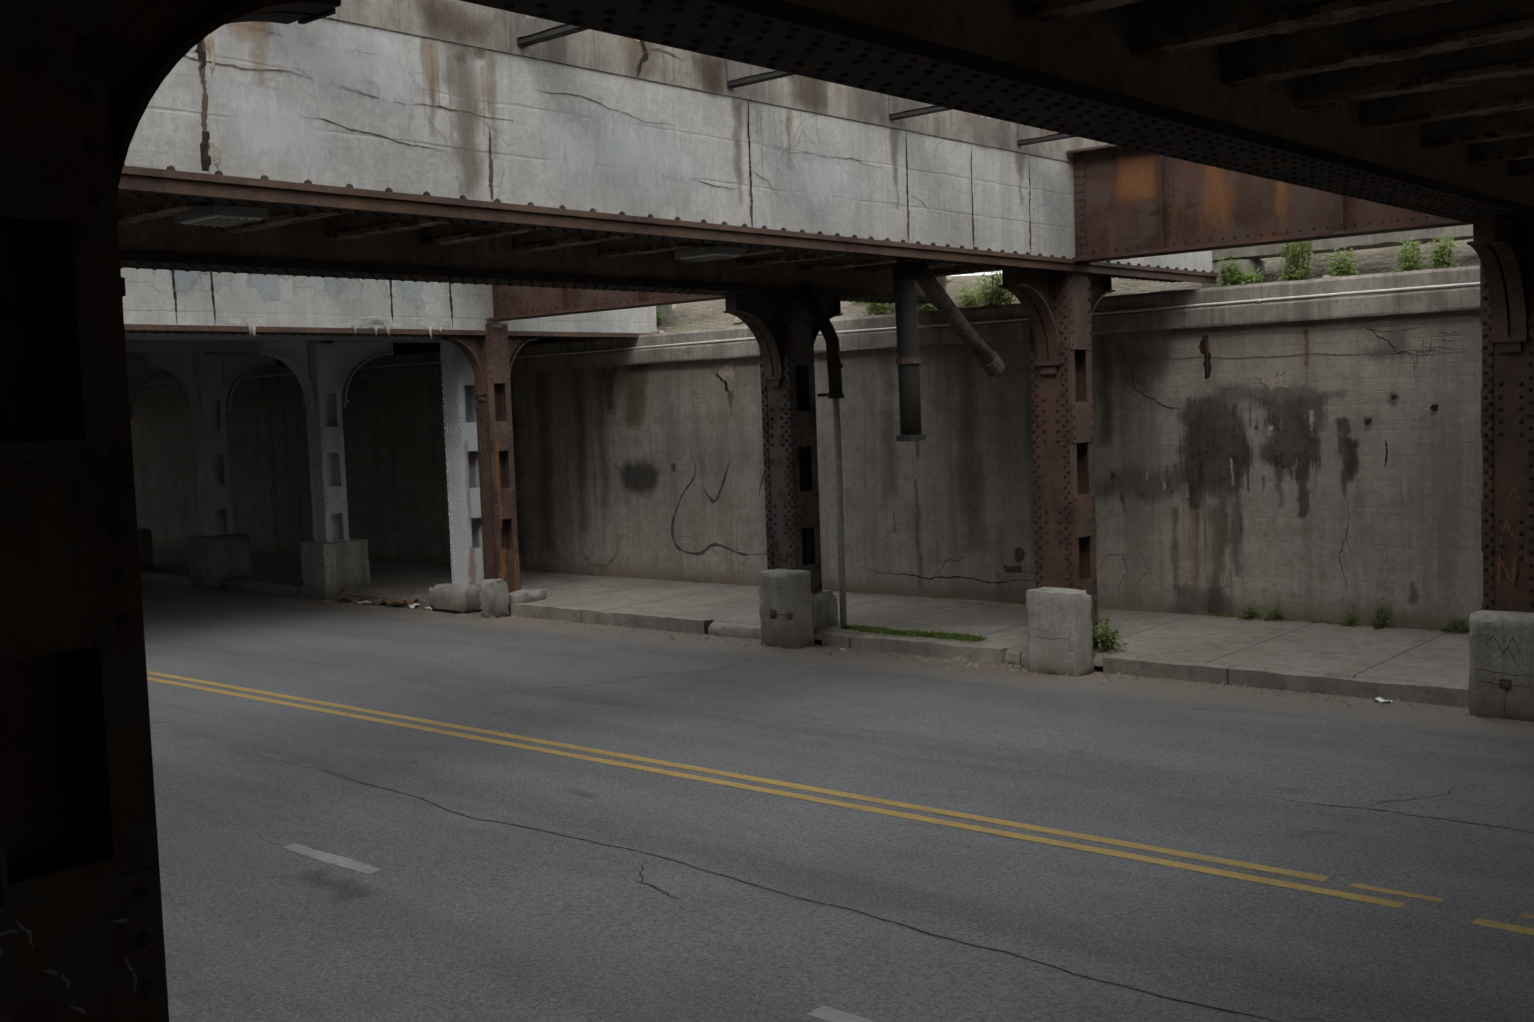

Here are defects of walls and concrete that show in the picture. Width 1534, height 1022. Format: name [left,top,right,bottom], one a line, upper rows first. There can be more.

crack [184,25,514,199]
crack [535,90,676,126]
crack [630,39,683,77]
crack [606,101,930,241]
crack [969,144,977,247]
peeling [154,269,362,301]
peeling [384,280,436,308]
damp [1098,339,1358,517]